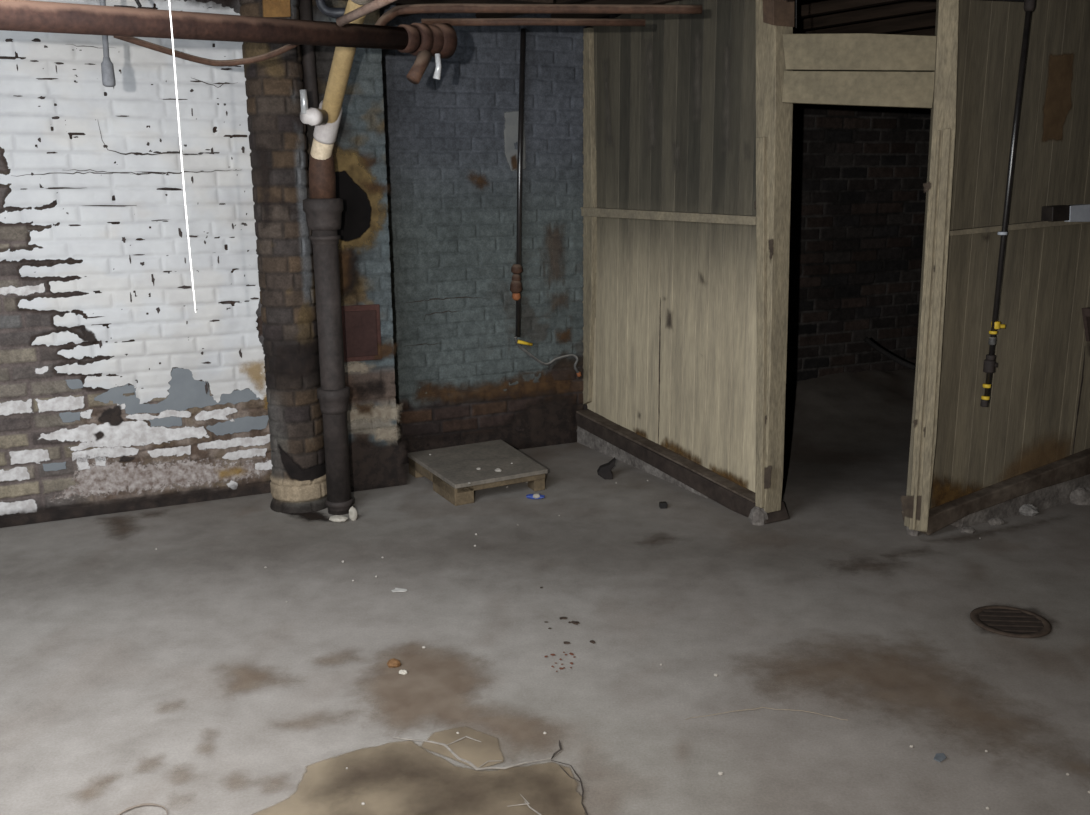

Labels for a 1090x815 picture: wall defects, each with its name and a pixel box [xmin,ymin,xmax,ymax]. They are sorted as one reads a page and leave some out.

peeling [32,0,240,15]
peeling [0,30,326,482]
corrosion [416,372,570,401]
peeling [0,499,37,516]
leakage [253,726,586,815]
crack [394,736,588,815]